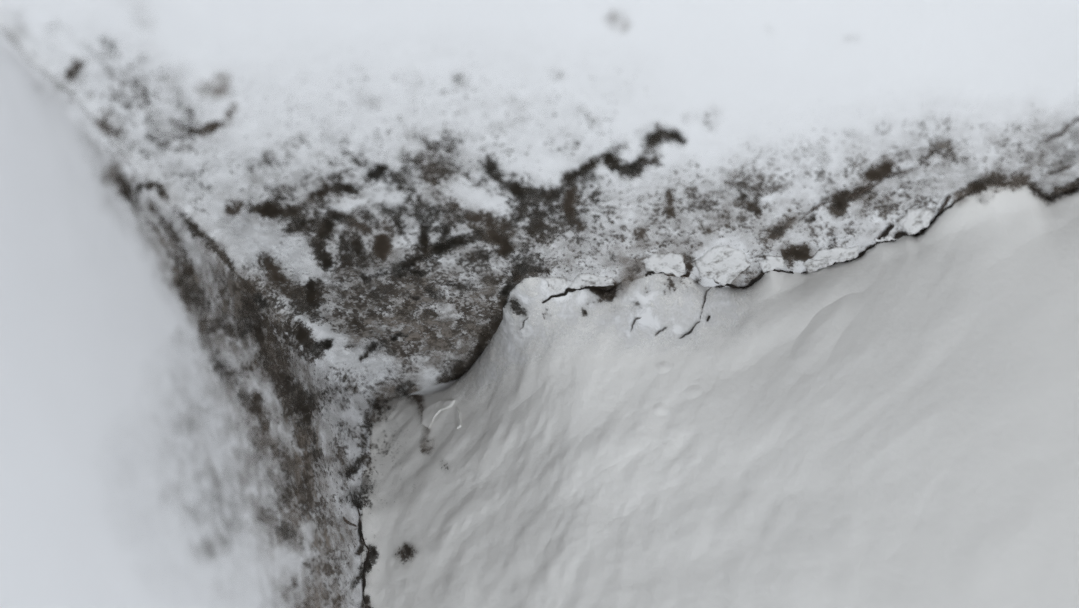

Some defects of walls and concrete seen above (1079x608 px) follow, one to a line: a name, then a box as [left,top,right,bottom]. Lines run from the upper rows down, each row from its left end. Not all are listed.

leakage [52,38,237,214]
spalling [874,205,935,242]
crack [513,267,591,330]
peeling [545,273,617,290]
spalling [639,245,785,286]
spalling [803,245,859,273]
leakage [104,105,1079,608]